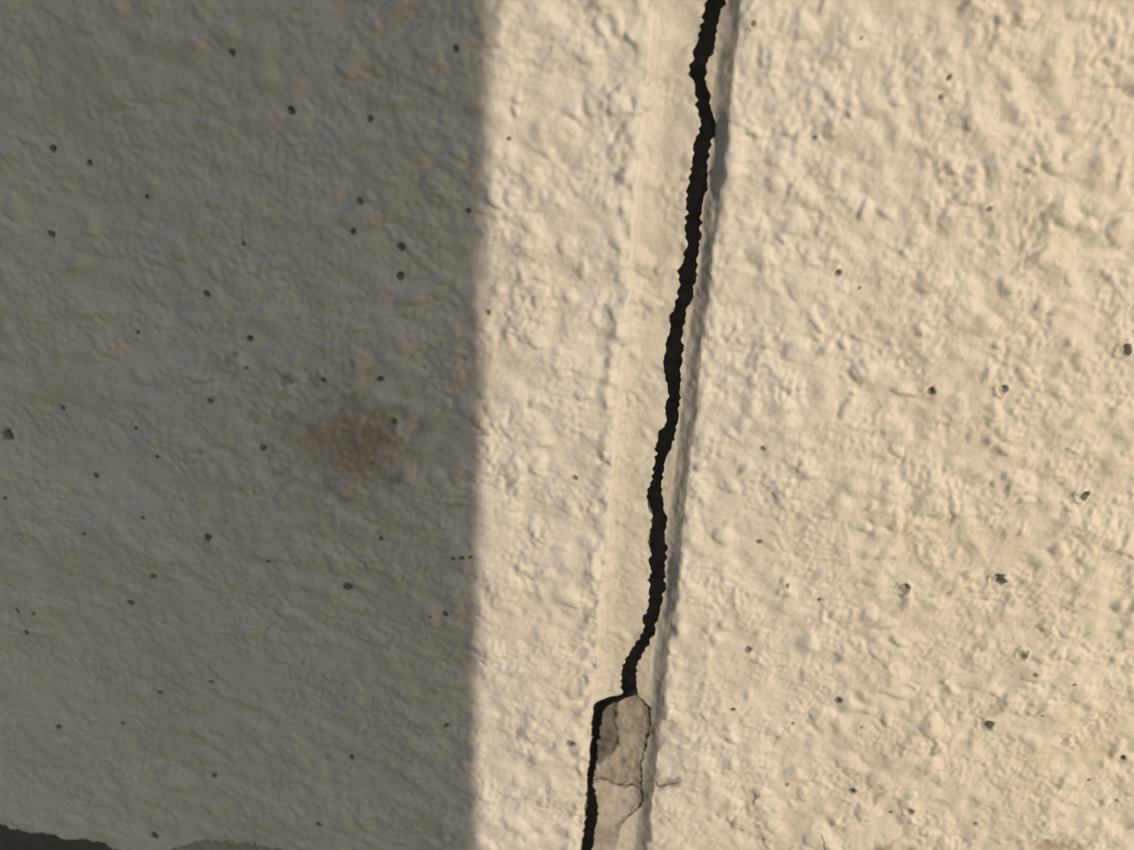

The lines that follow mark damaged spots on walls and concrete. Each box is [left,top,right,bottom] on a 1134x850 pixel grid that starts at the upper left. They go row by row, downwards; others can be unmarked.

spalling [593,695,652,837]
crack [580,0,726,850]